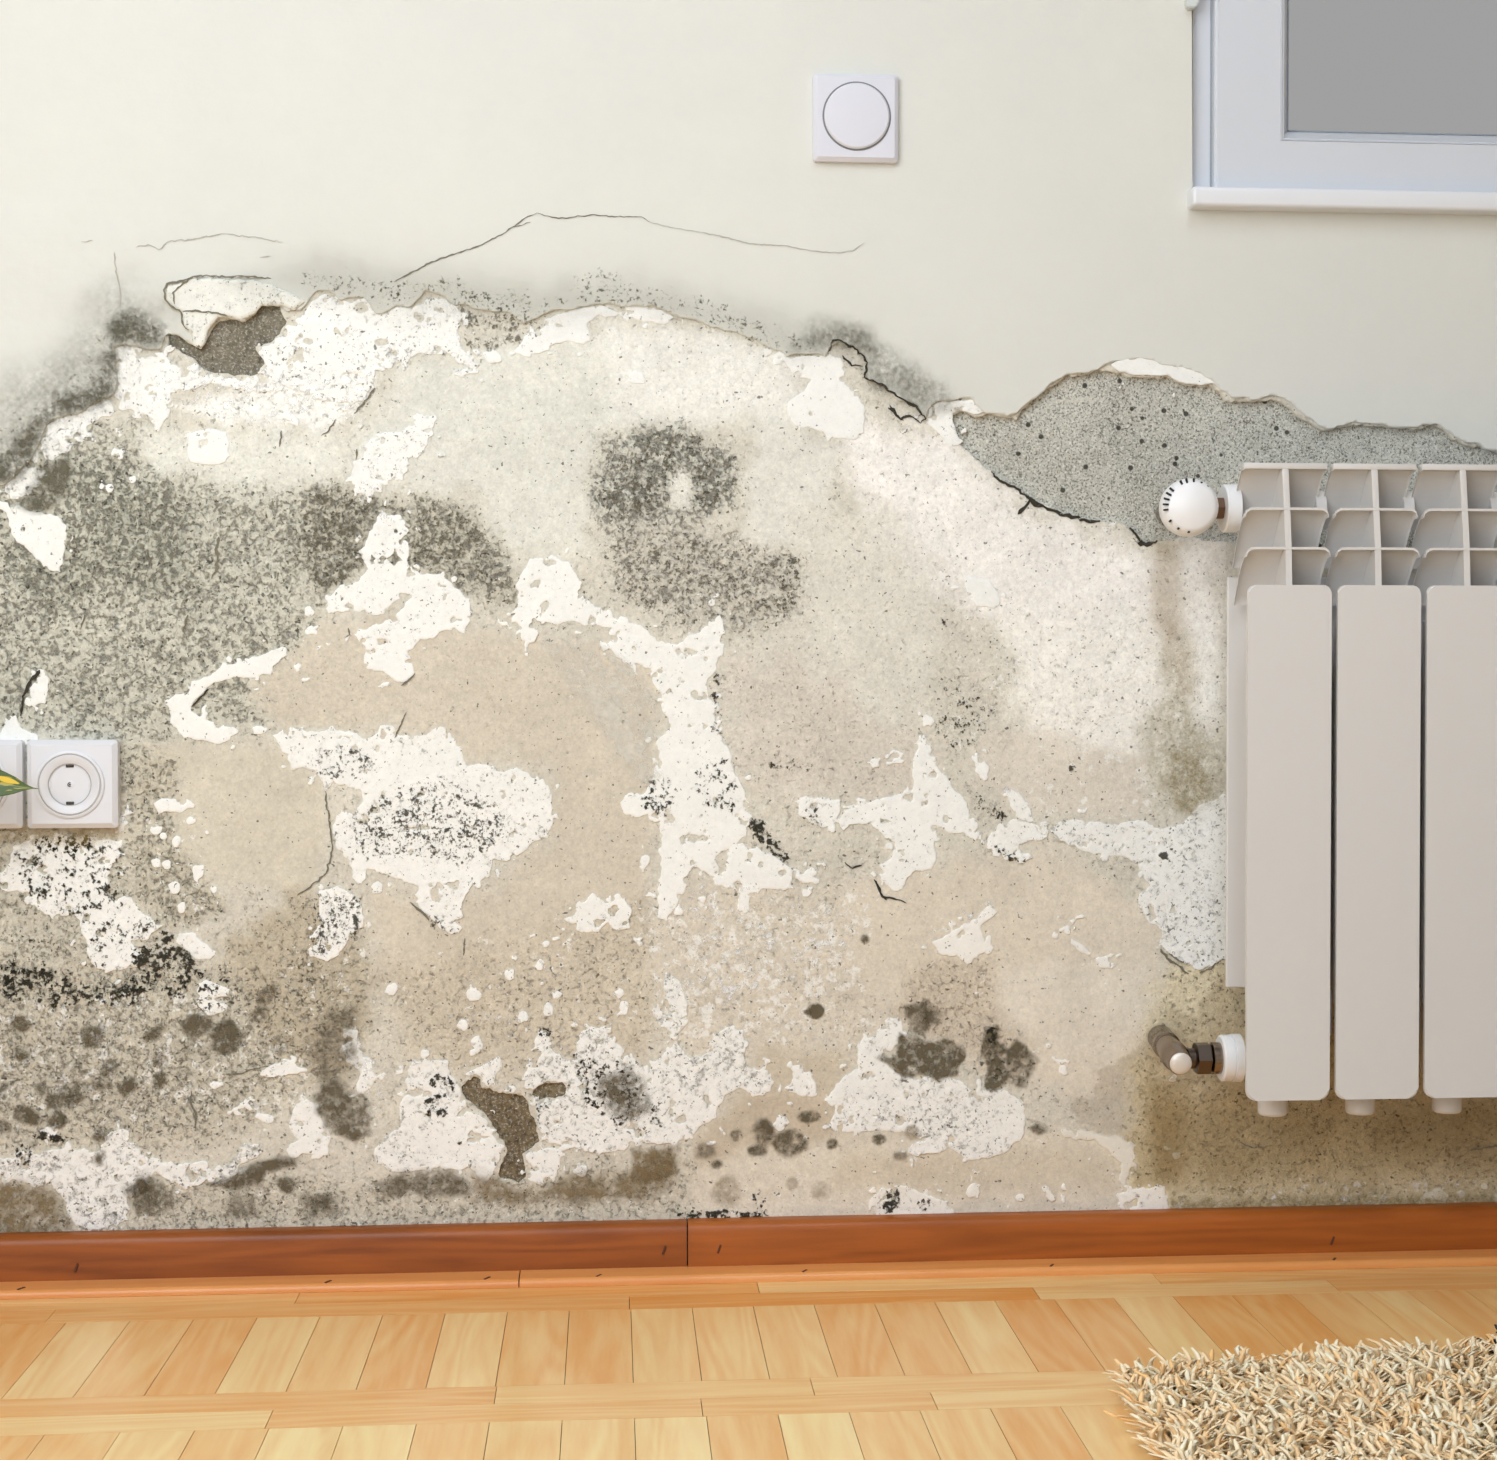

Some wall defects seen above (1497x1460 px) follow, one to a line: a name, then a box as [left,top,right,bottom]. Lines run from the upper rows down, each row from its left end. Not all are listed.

crack [394,213,862,282]
leakage [606,431,800,624]
peeling [0,277,1497,1233]
leakage [349,776,505,864]
leakage [0,831,384,1166]
leakage [416,1074,454,1117]
leakage [573,1023,662,1130]
leakage [731,1112,819,1155]
leakage [804,1004,824,1019]
leakage [881,1003,1033,1092]
leakage [126,1159,338,1229]
leakage [883,1189,930,1214]